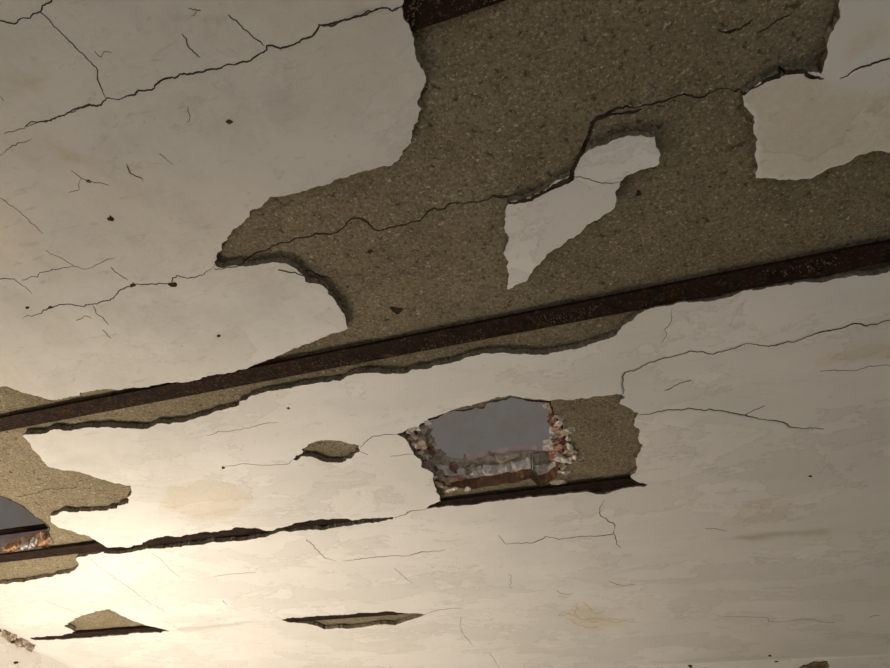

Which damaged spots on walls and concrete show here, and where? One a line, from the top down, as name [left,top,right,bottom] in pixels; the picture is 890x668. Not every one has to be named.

crack [757,13,792,33]
crack [0,0,402,155]
crack [0,58,890,337]
flaking render [218,0,890,366]
crack [620,312,890,394]
flaking render [0,311,640,581]
crack [639,380,823,430]
flaking render [1,630,35,652]
flaking render [68,609,146,632]
flaking render [314,613,419,626]